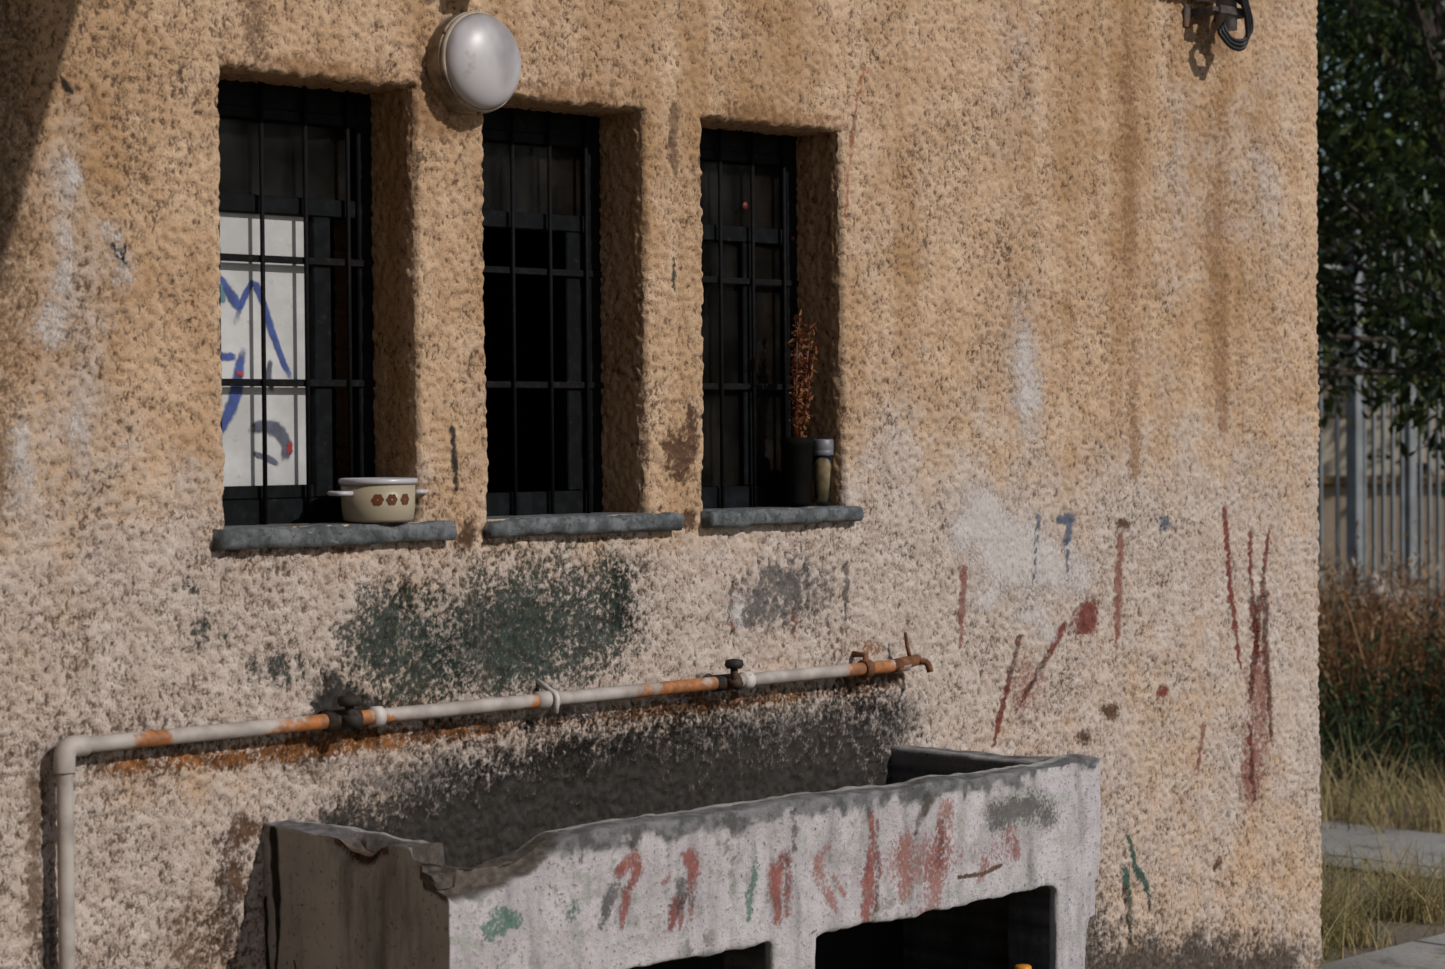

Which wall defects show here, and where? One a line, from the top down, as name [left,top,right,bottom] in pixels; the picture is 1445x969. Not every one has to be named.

water stain [683,508,696,534]
water stain [181,618,227,653]
water stain [240,519,653,712]
corrosion [94,672,904,783]
water stain [297,688,927,867]